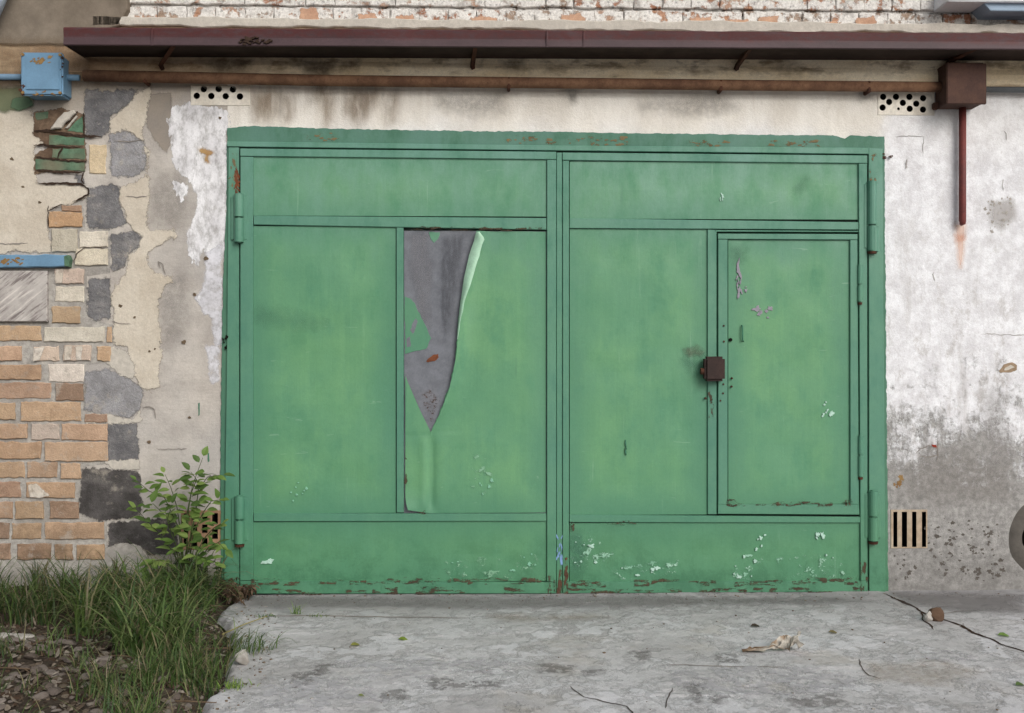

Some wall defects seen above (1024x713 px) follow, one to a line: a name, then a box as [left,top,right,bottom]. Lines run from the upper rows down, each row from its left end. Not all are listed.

flaking render [32,88,146,322]
peeling [166,101,237,383]
flaking render [79,368,178,555]
corrosion [248,557,868,595]
peeling [556,534,612,566]
peeling [616,561,677,579]
crack [887,594,1024,652]